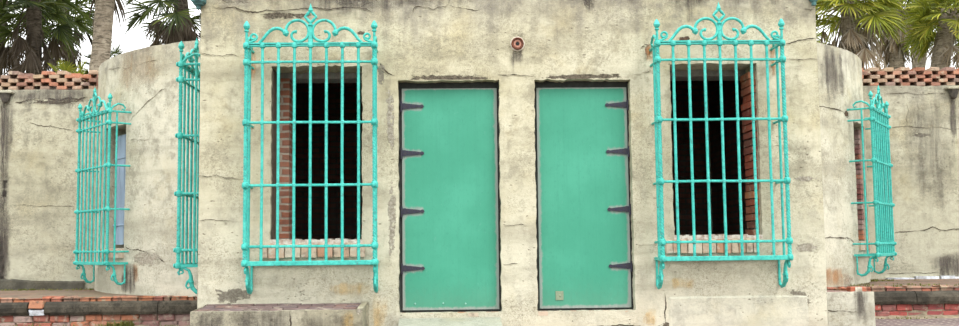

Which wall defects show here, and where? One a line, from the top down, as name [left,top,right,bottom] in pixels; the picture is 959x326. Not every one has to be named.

crack [202,0,378,15]
crack [413,0,481,12]
leakage [2,109,11,158]
crack [895,225,959,233]
leakage [939,256,959,277]